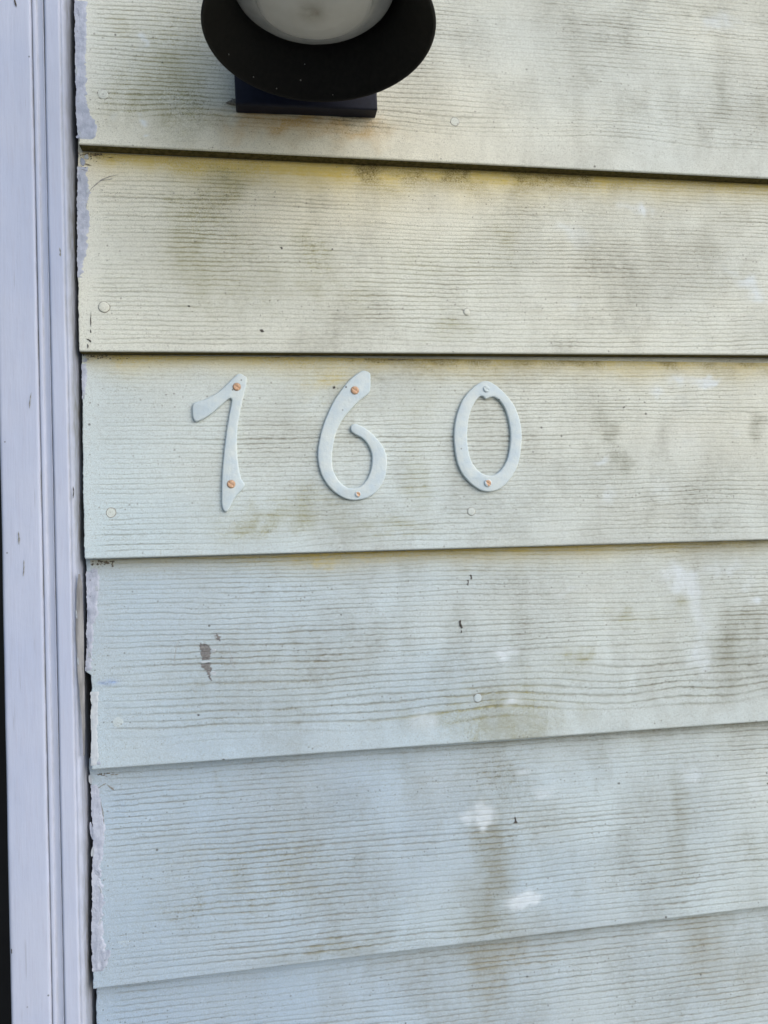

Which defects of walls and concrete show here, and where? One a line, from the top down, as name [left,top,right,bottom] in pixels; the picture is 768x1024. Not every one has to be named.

leakage [78,0,768,573]
peeling [199,631,235,681]